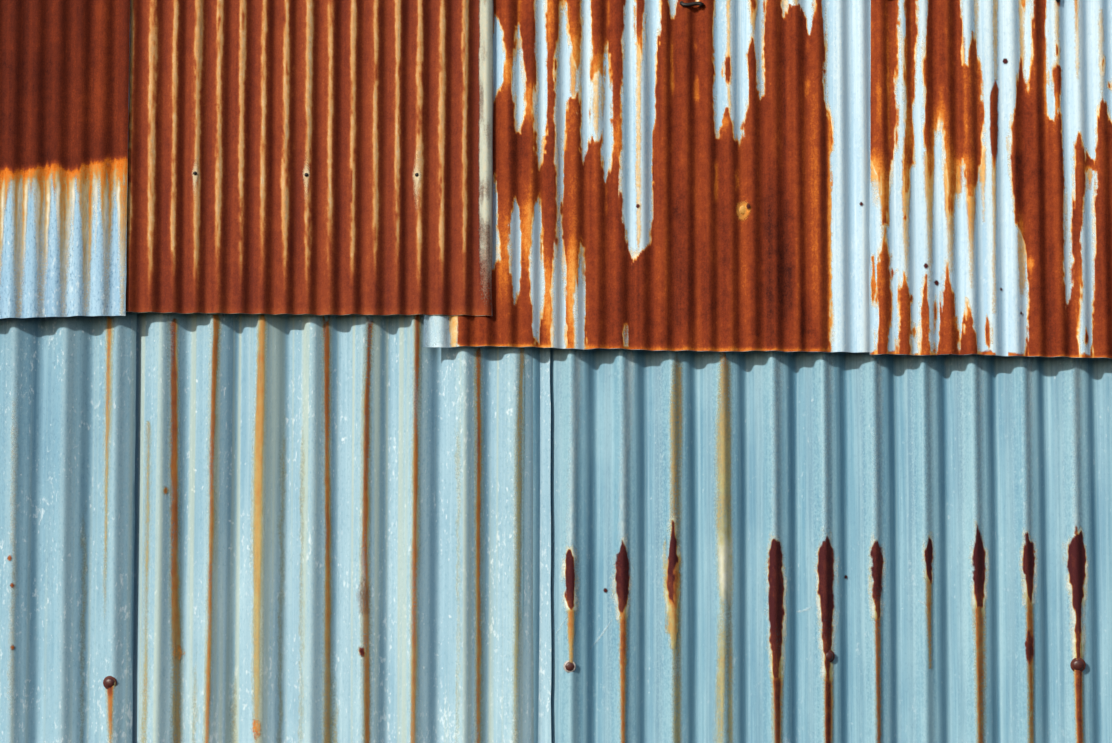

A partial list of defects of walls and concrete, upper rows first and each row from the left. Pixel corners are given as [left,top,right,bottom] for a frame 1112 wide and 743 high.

corrosion [870,0,1112,358]
corrosion [0,0,834,743]
corrosion [815,536,839,743]
corrosion [868,537,885,743]
corrosion [923,535,933,669]
corrosion [971,525,988,743]
corrosion [1020,531,1037,743]
corrosion [1066,527,1088,743]